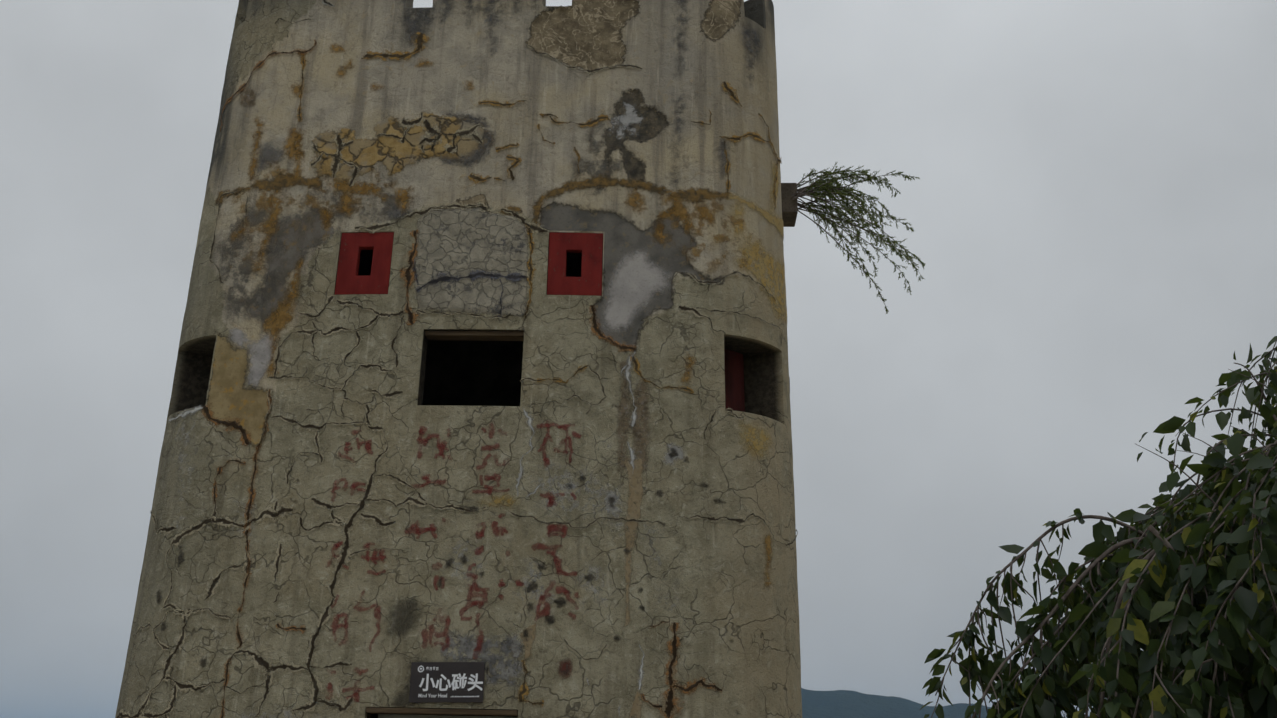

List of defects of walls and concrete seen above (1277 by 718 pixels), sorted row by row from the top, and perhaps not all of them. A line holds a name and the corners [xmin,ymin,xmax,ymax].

spalling [525,0,640,71]
spalling [700,0,741,41]
peeling [310,112,495,184]
peeling [603,89,670,181]
damp [217,210,284,314]
peeling [538,202,724,352]
damp [207,329,275,447]
crack [116,0,798,718]